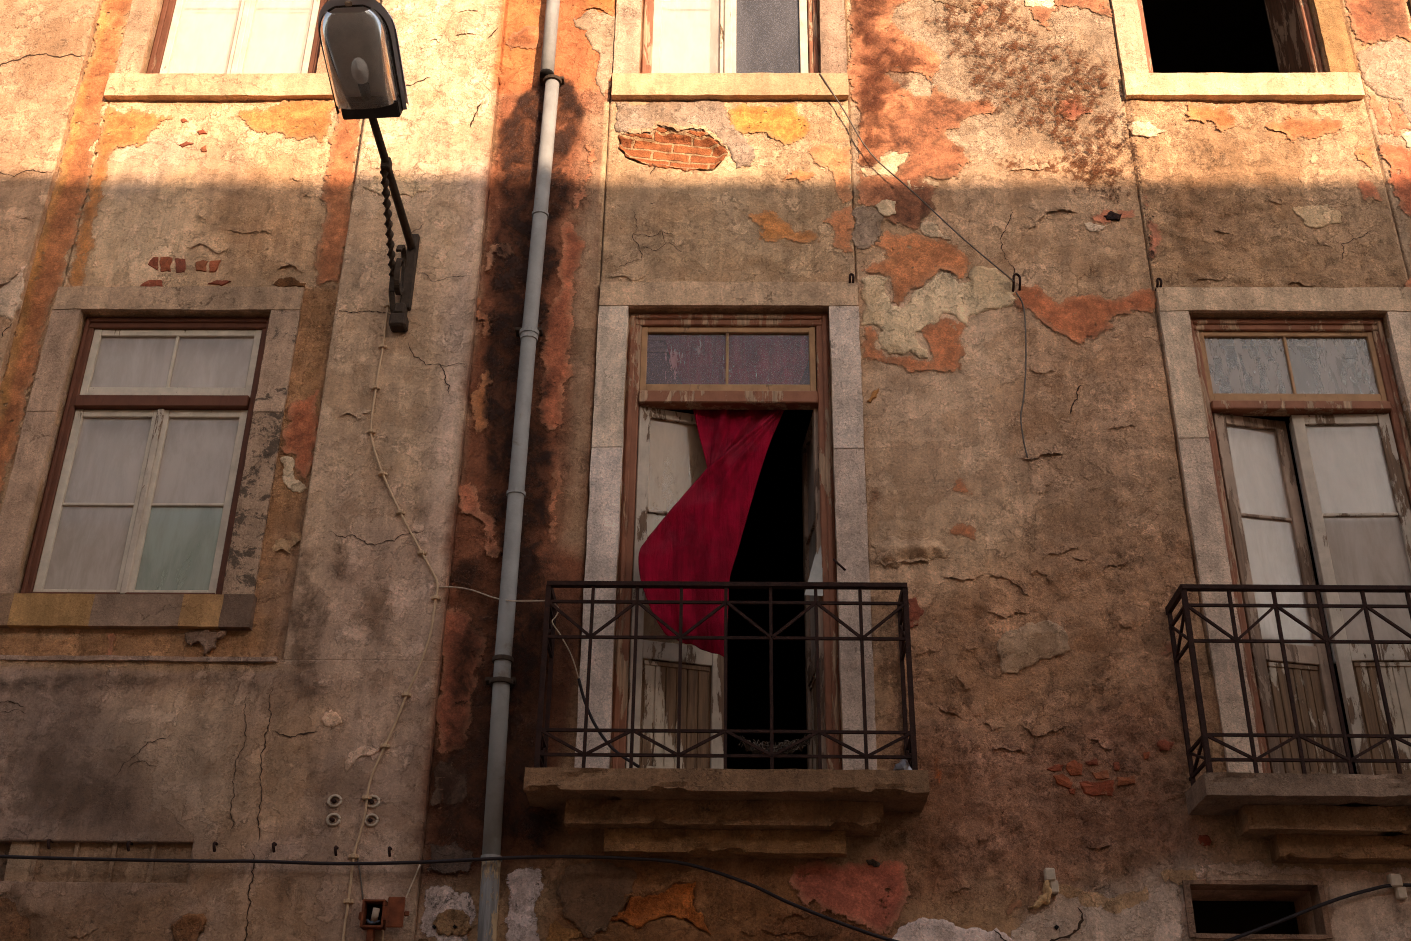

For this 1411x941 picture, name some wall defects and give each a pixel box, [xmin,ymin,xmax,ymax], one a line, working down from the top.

crack [0,53,85,66]
peeling [0,0,207,492]
flaking render [140,237,235,287]
peeling [618,0,1165,373]
water stain [920,0,1142,202]
flaking render [1345,0,1411,216]
water stain [435,78,585,847]
crack [229,686,317,941]
peeling [418,885,476,941]
flaking render [611,881,712,936]
flaking render [981,709,1136,796]
flaking render [777,855,1411,941]